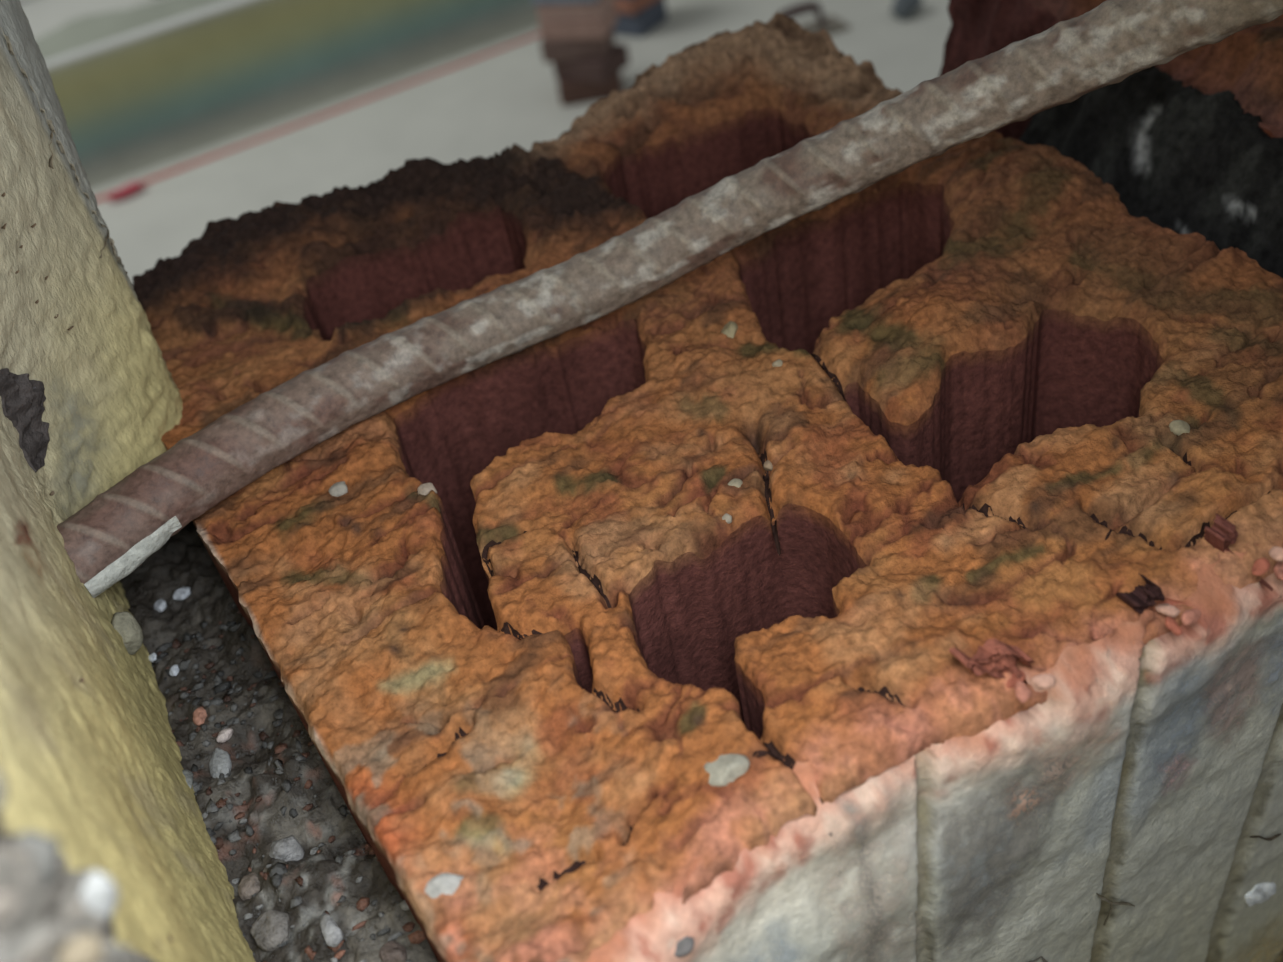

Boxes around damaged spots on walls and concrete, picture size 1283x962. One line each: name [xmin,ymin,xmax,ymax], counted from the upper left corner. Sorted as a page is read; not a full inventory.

crack [811,353,847,402]
spalling [0,368,50,473]
crack [757,450,781,556]
crack [958,503,1026,529]
crack [1090,511,1237,550]
crack [570,549,612,608]
crack [499,622,543,640]
crack [592,688,640,713]
crack [852,686,905,707]
crack [753,741,796,770]
leakage [943,763,1065,945]
crack [537,860,595,891]